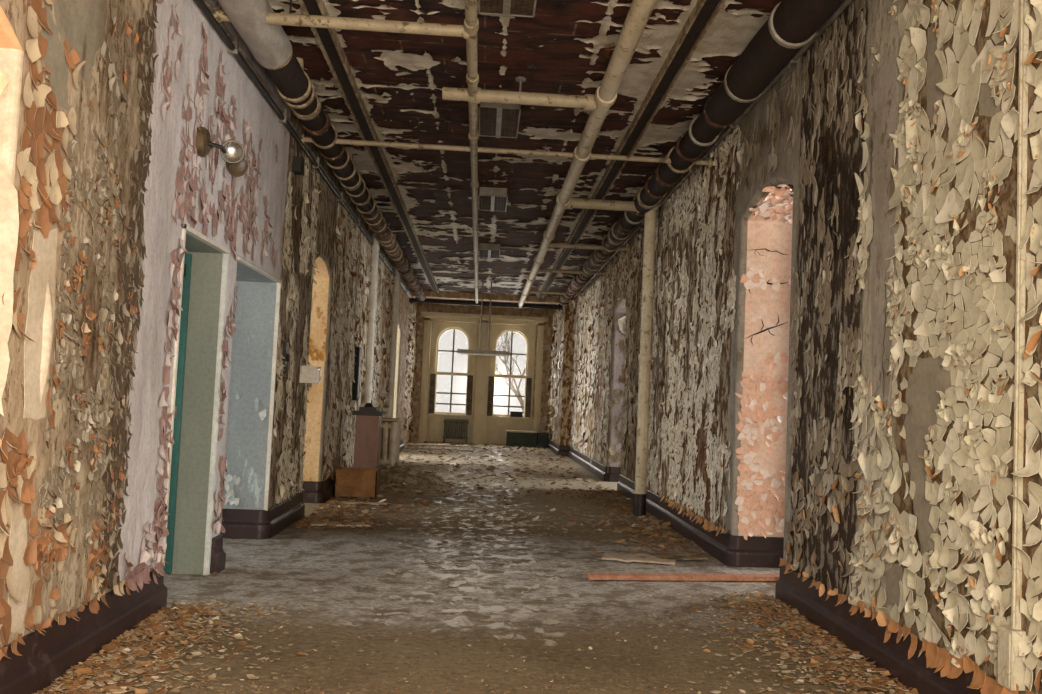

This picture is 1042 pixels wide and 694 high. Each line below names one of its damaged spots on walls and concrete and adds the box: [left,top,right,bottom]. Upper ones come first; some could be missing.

peeling [0,0,395,660]
flaking render [303,0,1042,694]
crack [745,317,788,345]